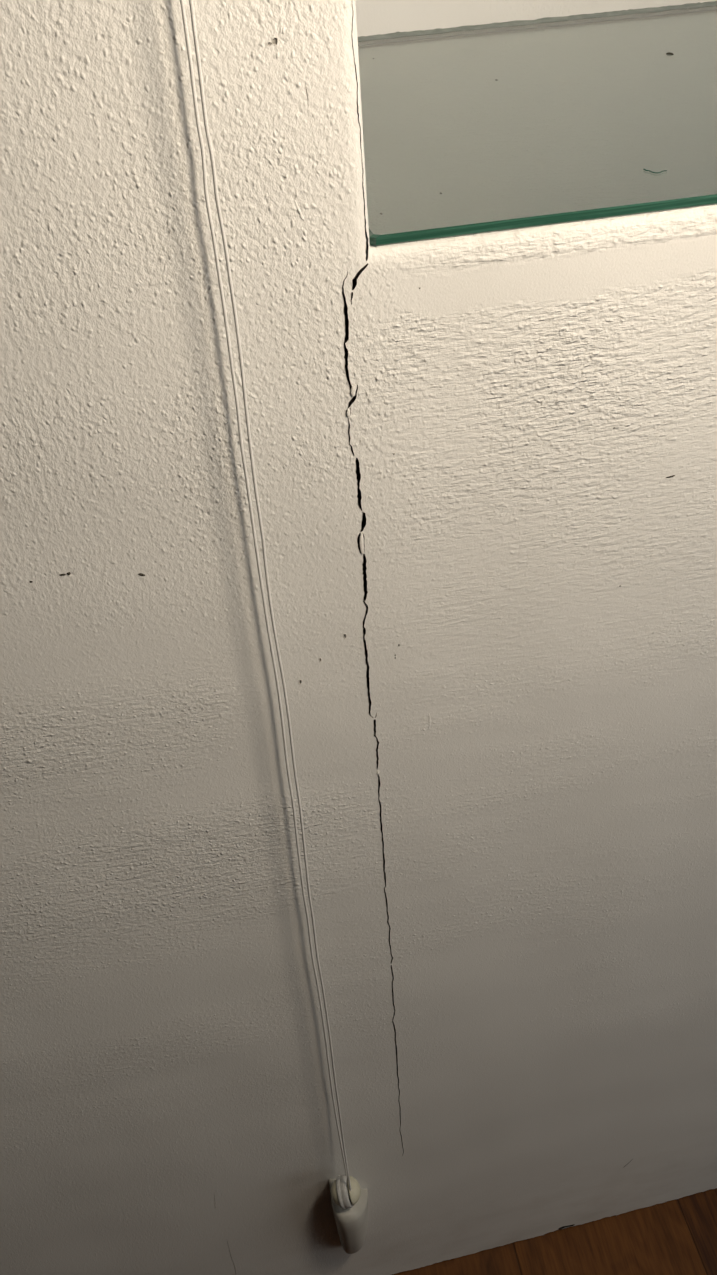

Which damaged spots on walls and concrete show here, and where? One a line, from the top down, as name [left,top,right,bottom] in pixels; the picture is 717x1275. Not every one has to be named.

crack [341,0,404,1156]